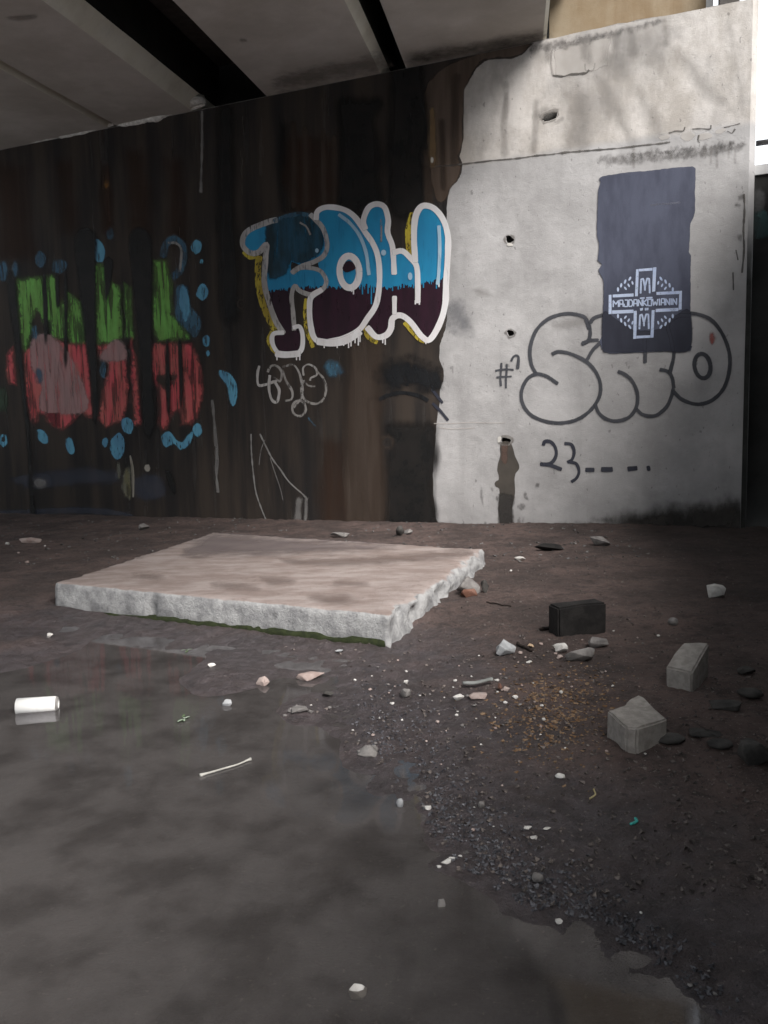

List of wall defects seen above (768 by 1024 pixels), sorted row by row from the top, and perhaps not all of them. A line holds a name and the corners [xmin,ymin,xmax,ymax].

peeling [553,38,610,77]
hole [541,109,559,124]
crack [436,123,740,167]
leakage [0,35,545,524]
leakage [606,254,752,528]